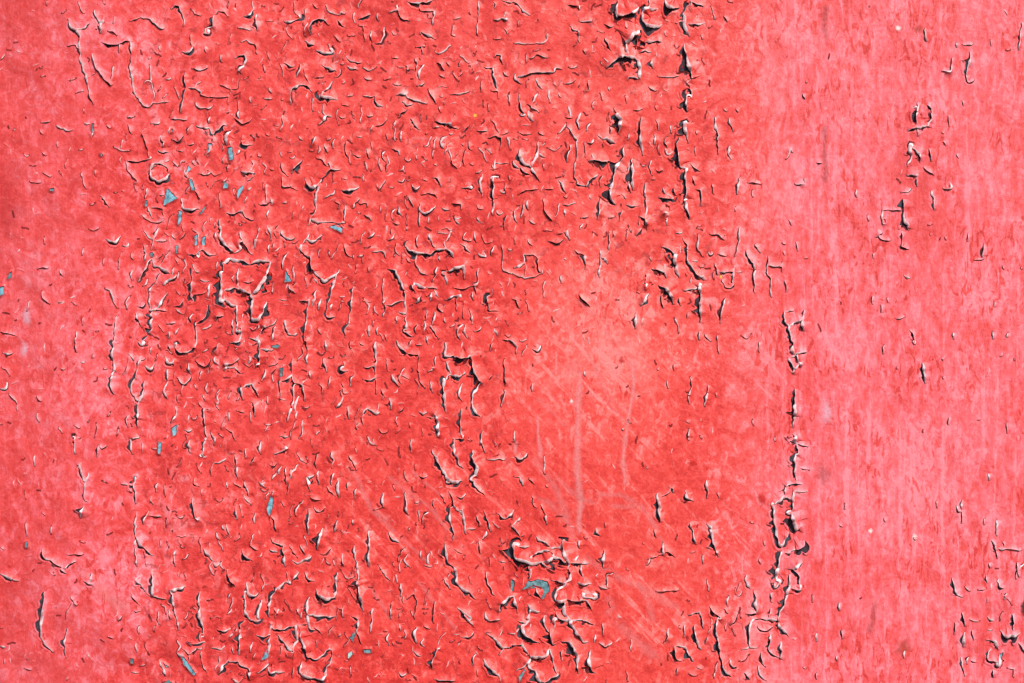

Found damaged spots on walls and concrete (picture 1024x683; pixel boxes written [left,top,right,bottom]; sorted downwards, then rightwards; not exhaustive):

crack [29,0,295,200]
peeling [894,101,955,231]
crack [26,236,132,395]
crack [120,0,659,682]
peeling [87,0,727,683]
crack [657,364,720,441]
peeling [778,304,822,376]
peeling [51,567,116,620]
crack [667,625,684,675]
crack [643,465,725,593]
peeling [661,441,812,683]
peeling [947,561,1024,678]